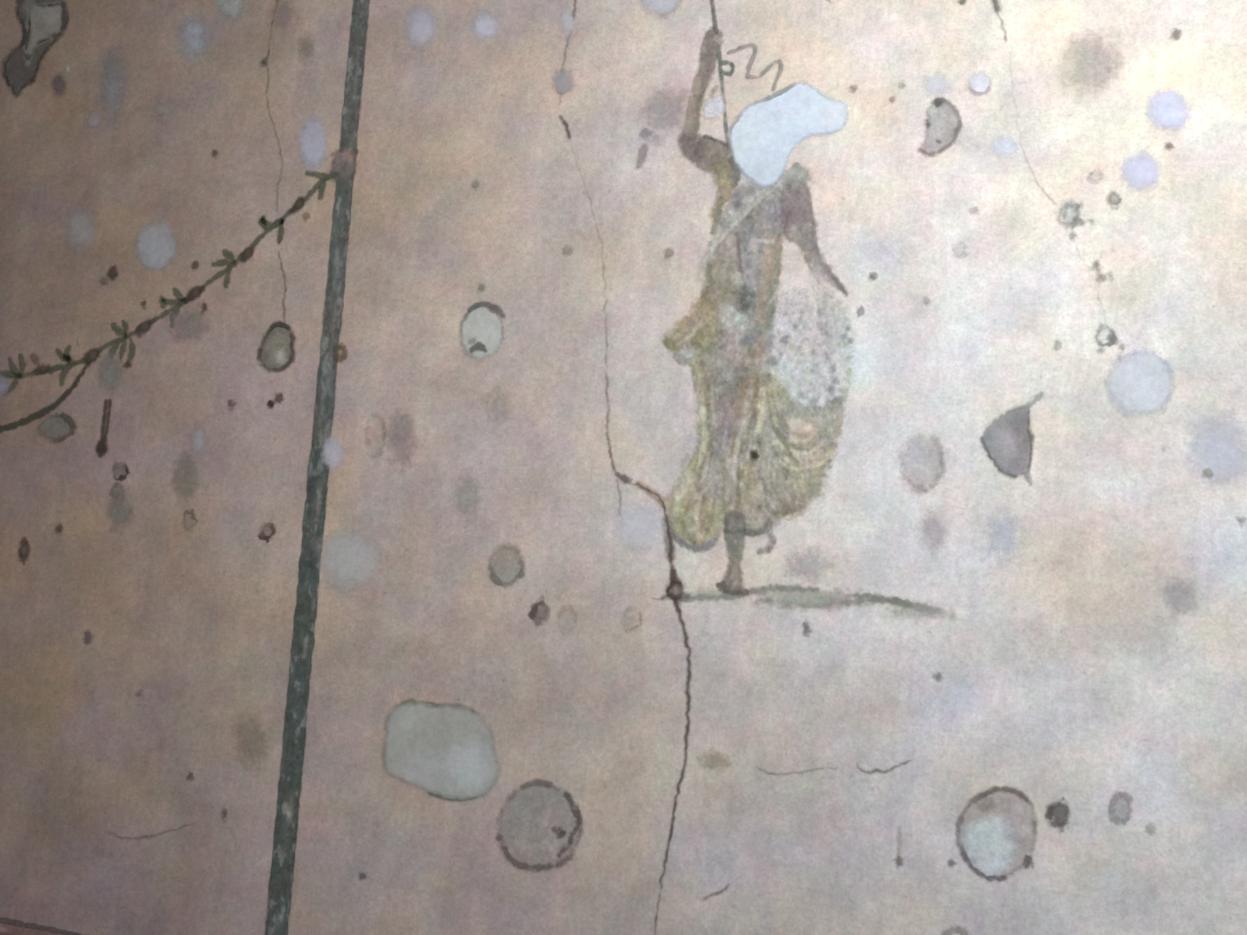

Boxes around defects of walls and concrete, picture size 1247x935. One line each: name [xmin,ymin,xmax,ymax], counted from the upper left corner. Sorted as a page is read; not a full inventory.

spalling [4,0,69,95]
crack [560,116,571,138]
leakage [468,302,505,317]
leakage [470,338,486,352]
crack [609,449,691,883]